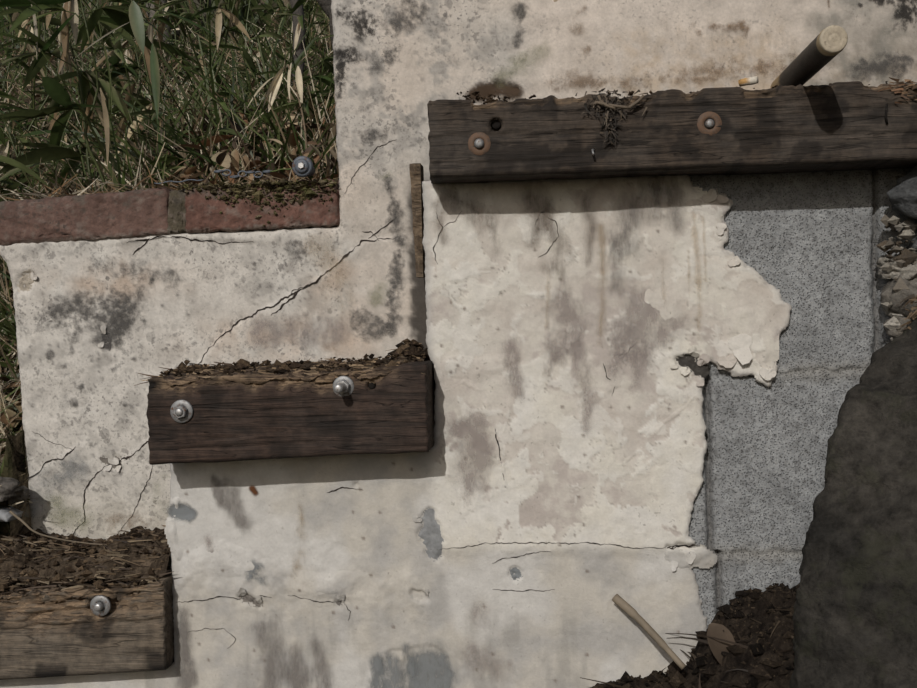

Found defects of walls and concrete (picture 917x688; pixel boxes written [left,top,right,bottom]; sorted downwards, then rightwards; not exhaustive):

mould [515,3,525,19]
mould [875,0,917,25]
damp [332,7,377,97]
mould [854,55,913,76]
flaking render [687,187,729,242]
crack [127,236,253,254]
crack [198,220,393,364]
flaking render [670,304,779,386]
crack [21,431,76,486]
crack [73,441,153,534]
peeling [412,508,444,562]
crack [442,542,698,562]